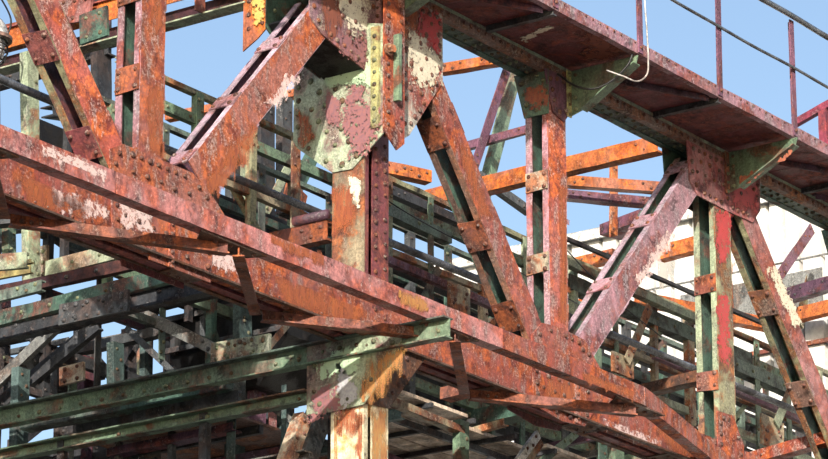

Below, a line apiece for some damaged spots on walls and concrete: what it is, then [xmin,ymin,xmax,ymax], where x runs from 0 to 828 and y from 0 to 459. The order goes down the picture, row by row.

peeling [324,0,385,161]
peeling [406,8,444,99]
rust [271,234,324,266]
rust [558,186,570,327]
rust [275,275,365,320]
peeling [767,266,802,328]
peeling [307,345,361,424]
rust [334,347,404,459]
rust [582,373,633,401]